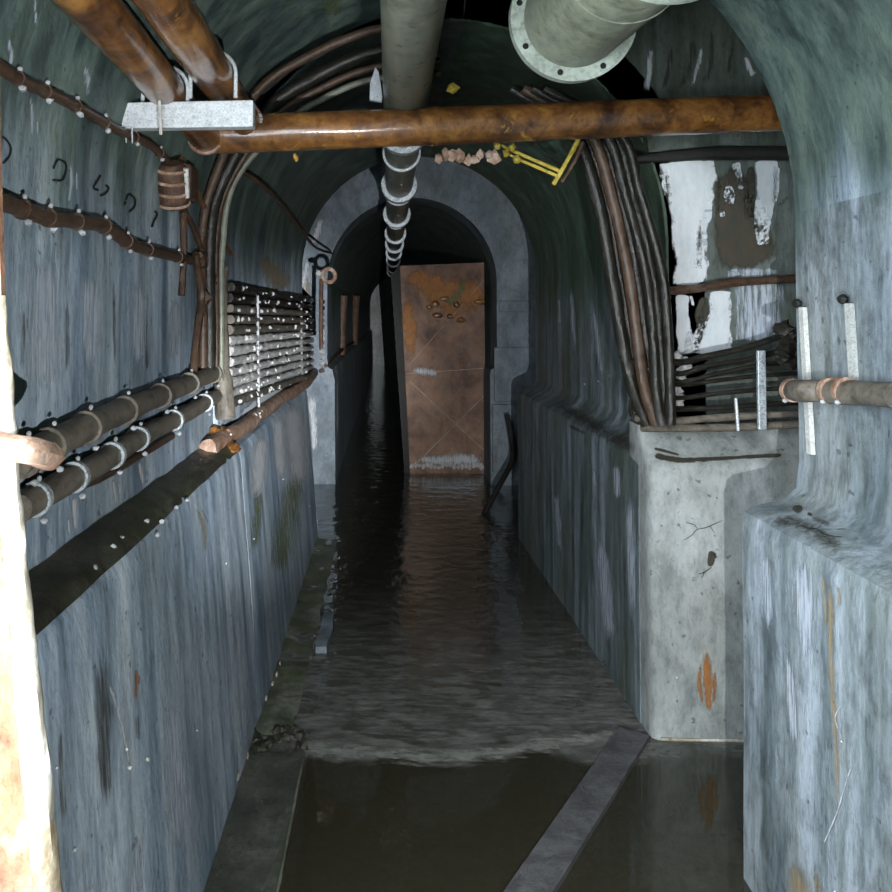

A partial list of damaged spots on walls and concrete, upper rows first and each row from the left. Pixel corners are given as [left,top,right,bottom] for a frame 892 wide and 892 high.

rust [403,301,417,355]
rust [407,271,483,316]
peeling [660,160,780,355]
leakage [97,668,129,796]
rust [697,654,716,708]
rust [823,581,840,792]